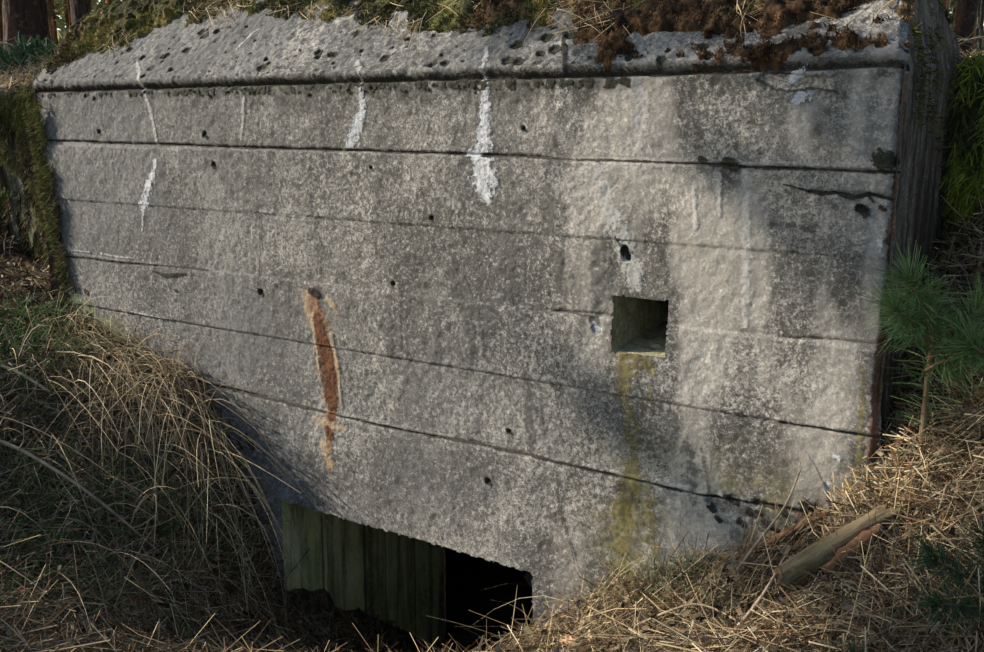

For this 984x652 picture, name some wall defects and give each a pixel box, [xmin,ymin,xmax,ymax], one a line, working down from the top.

water stain [135,62,159,146]
water stain [346,60,366,149]
water stain [466,47,498,206]
water stain [138,158,157,232]
corrosion [302,286,347,473]